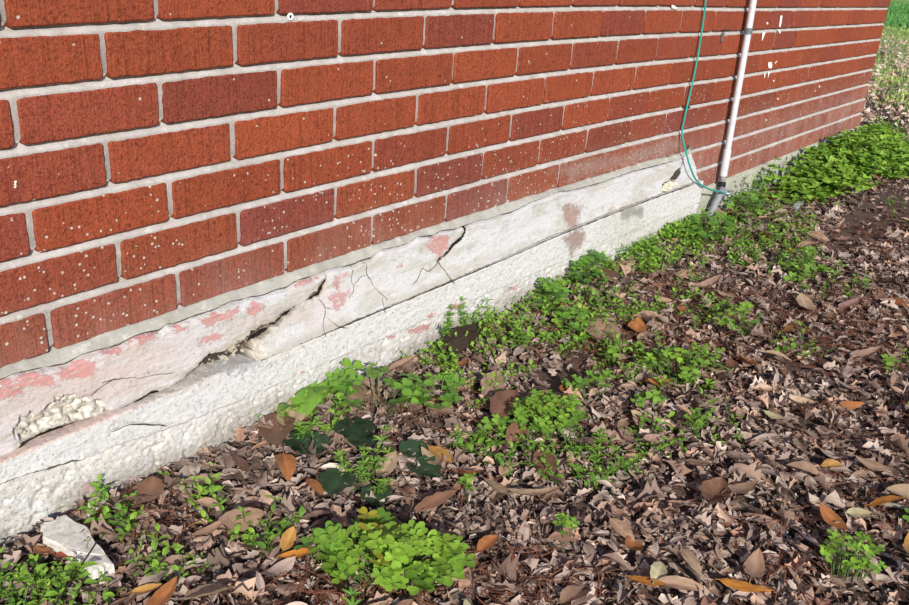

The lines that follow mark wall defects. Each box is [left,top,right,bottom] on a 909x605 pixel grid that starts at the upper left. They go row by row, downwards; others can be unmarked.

spalling [662,180,679,193]
crack [0,154,693,380]
peeling [197,301,266,347]
peeling [101,332,158,356]
crack [92,372,175,395]
spalling [0,359,159,448]
crack [112,423,165,432]